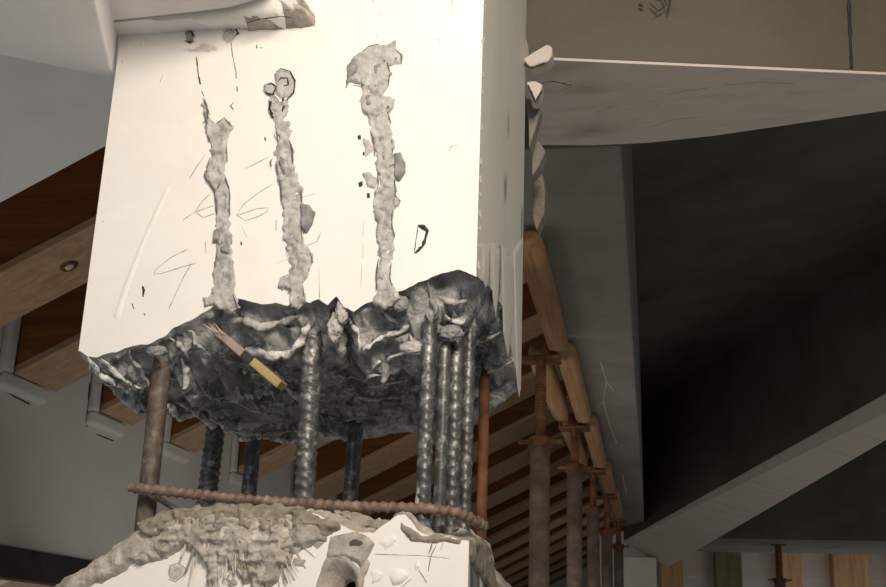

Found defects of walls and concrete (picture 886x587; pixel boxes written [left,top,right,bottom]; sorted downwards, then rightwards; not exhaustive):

spalling [244,0,316,31]
peeling [347,58,359,78]
spalling [524,40,572,235]
peeling [362,172,378,189]
peeling [394,152,406,182]
peeling [300,204,315,234]
peeling [213,228,231,254]
spalling [55,235,523,587]